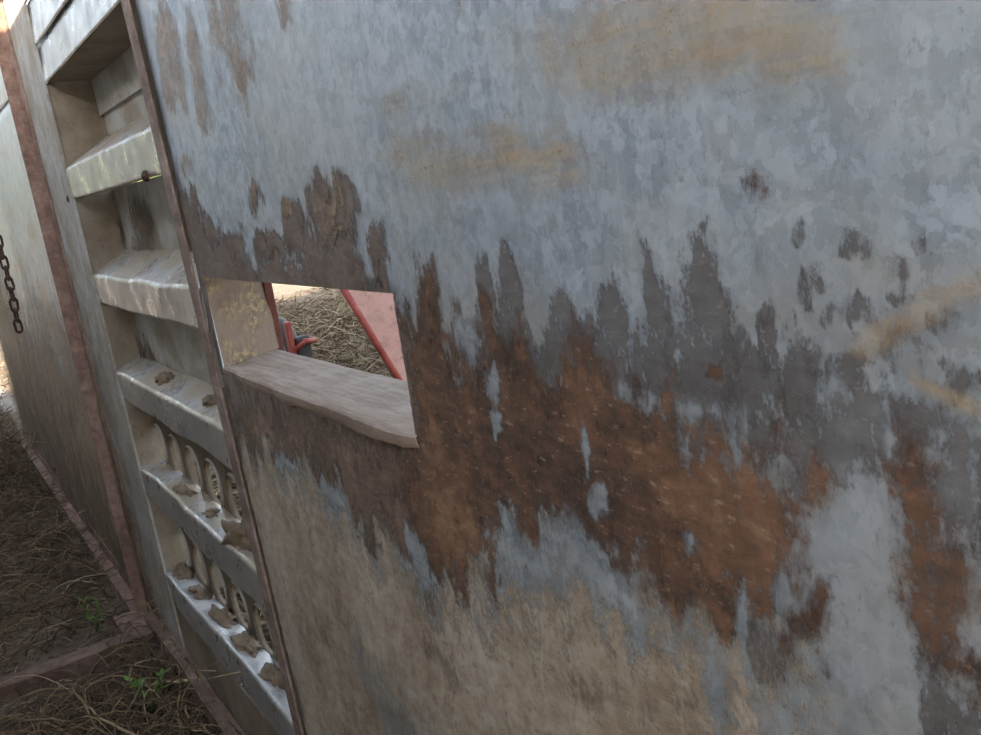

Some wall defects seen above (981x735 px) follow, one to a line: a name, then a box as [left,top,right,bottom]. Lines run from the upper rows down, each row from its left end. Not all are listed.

corrosion [839,230,870,260]
corrosion [886,257,914,307]
corrosion [846,288,872,329]
corrosion [940,356,981,407]
corrosion [225,267,835,653]
corrosion [882,435,981,706]